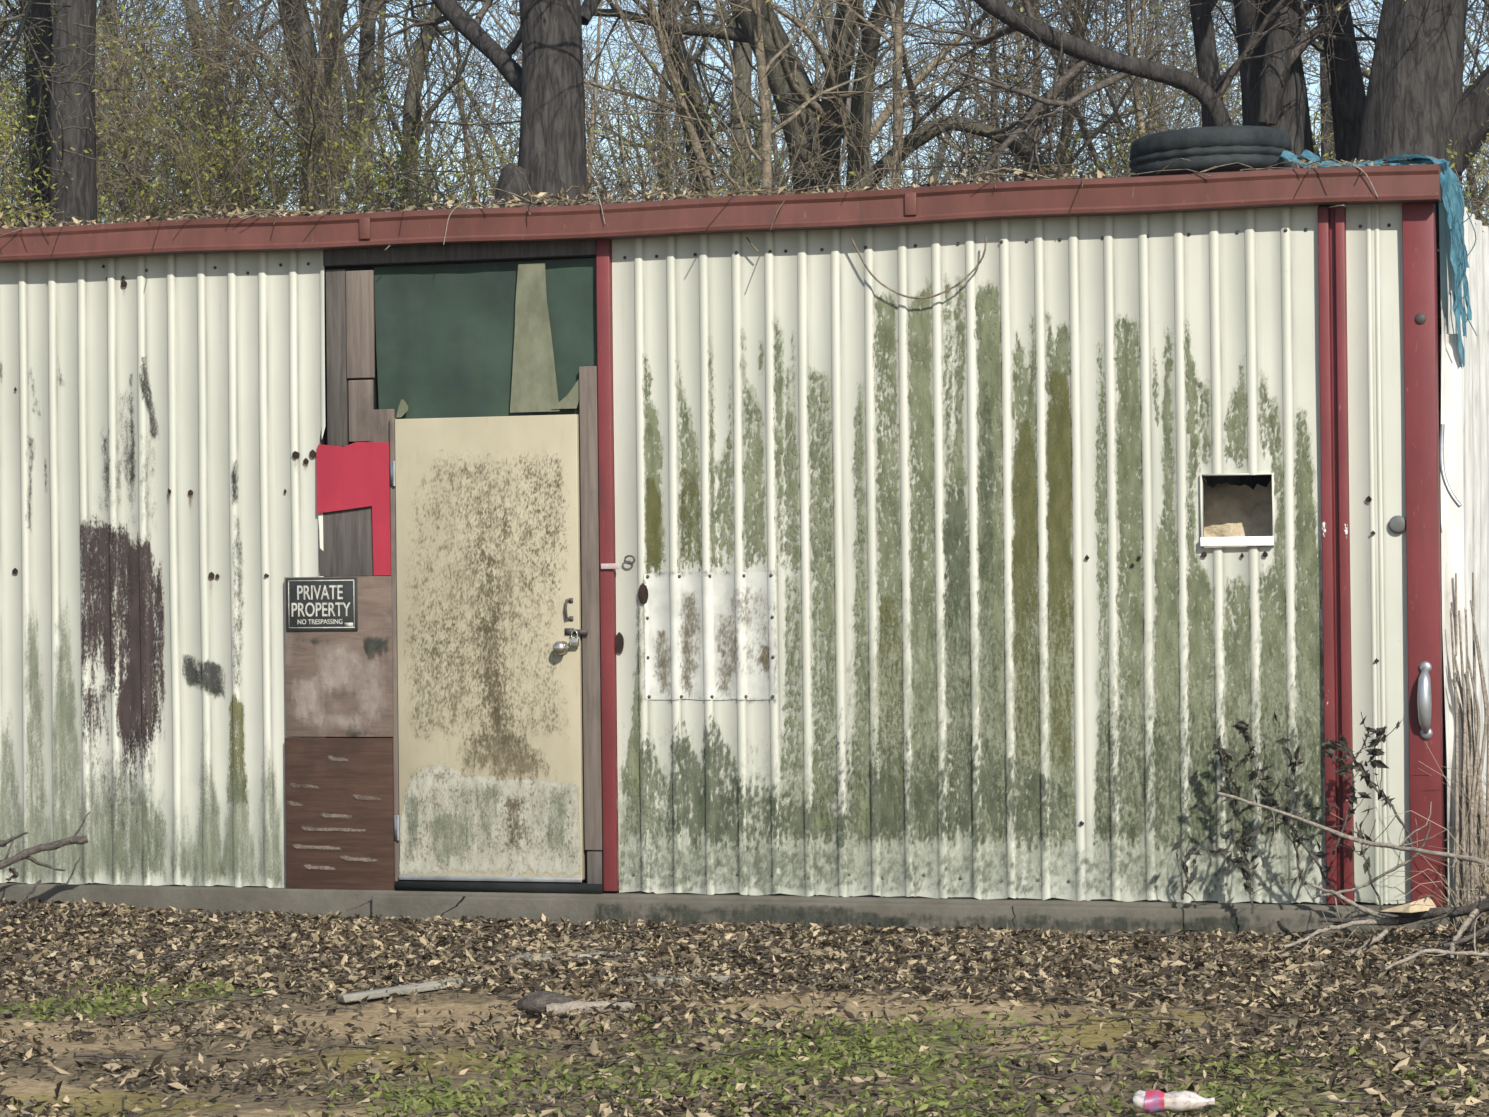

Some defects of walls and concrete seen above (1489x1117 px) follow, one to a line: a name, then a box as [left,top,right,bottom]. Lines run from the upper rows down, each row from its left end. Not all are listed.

leakage [0,627,282,881]
leakage [296,638,388,737]
leakage [405,461,575,861]
leakage [643,281,1325,850]